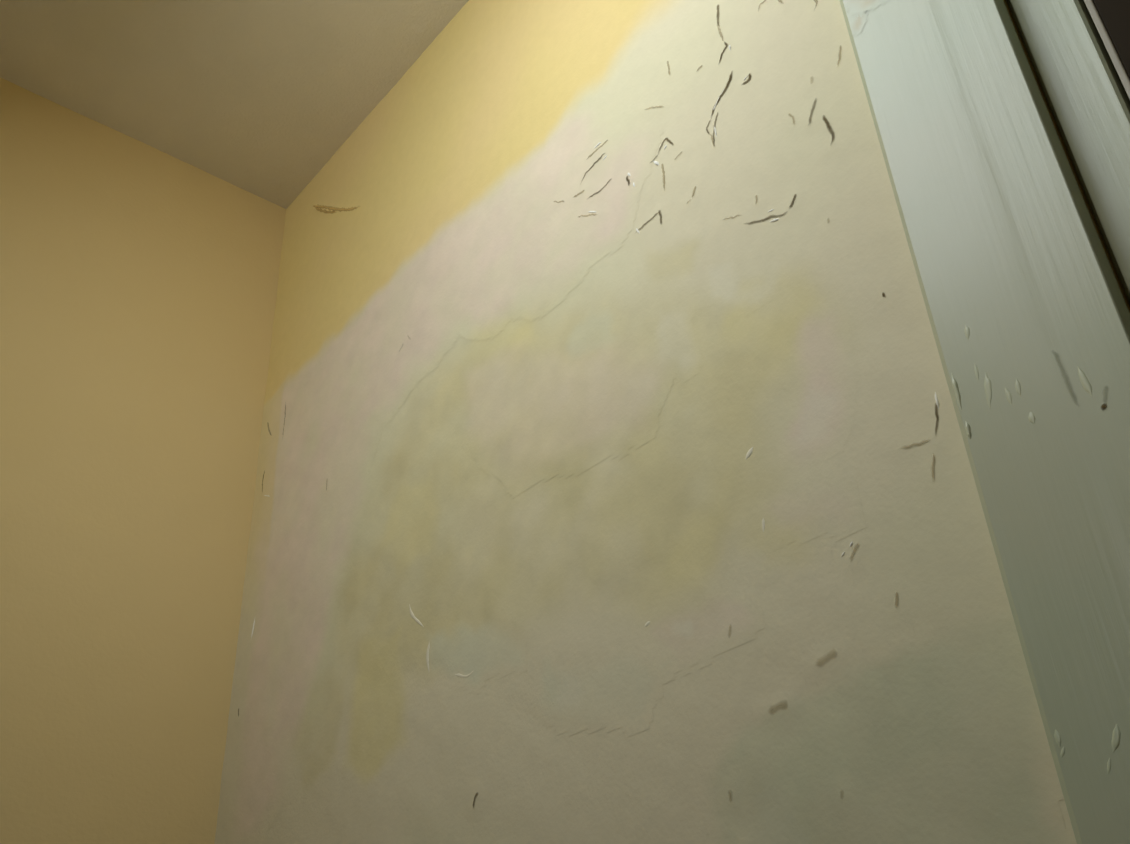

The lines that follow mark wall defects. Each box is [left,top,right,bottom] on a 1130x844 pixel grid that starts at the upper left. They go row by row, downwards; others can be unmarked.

crack [697,5,751,145]
crack [789,102,834,141]
crack [554,140,610,217]
crack [636,138,677,234]
crack [729,194,796,224]